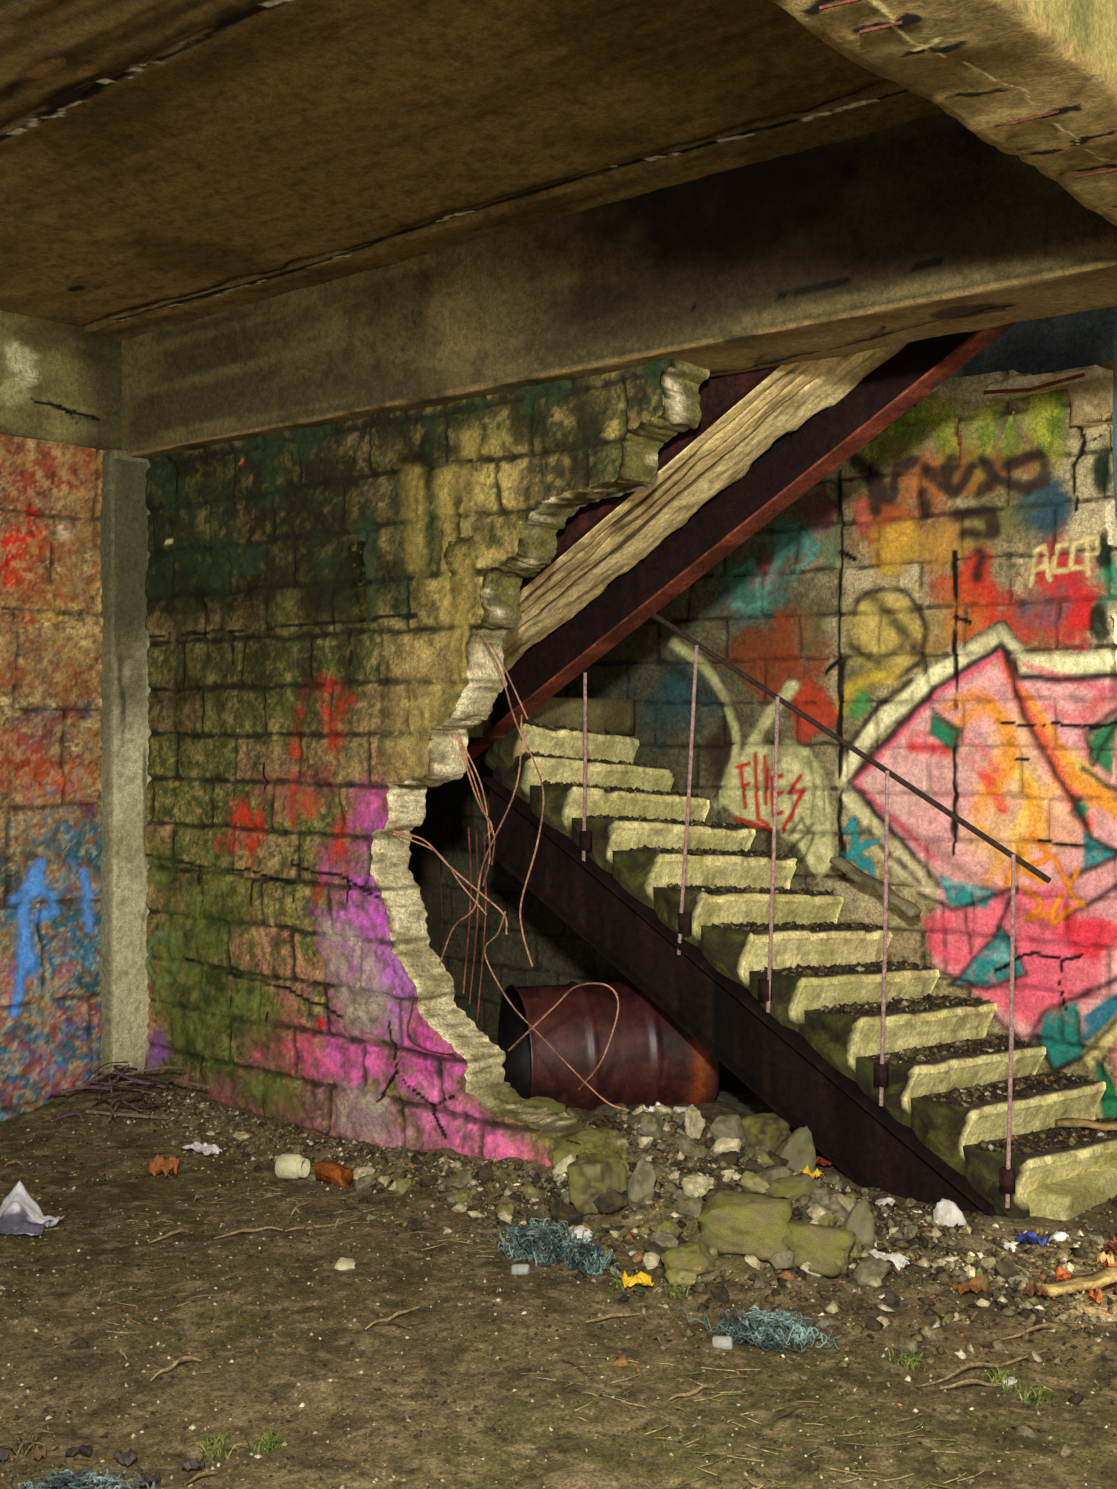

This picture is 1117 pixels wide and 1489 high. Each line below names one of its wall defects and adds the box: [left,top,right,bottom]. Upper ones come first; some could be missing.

crack [0,0,292,142]
crack [868,0,1107,161]
crack [114,89,909,321]
crack [912,258,943,270]
spalling [459,494,482,541]
spalling [388,678,443,763]